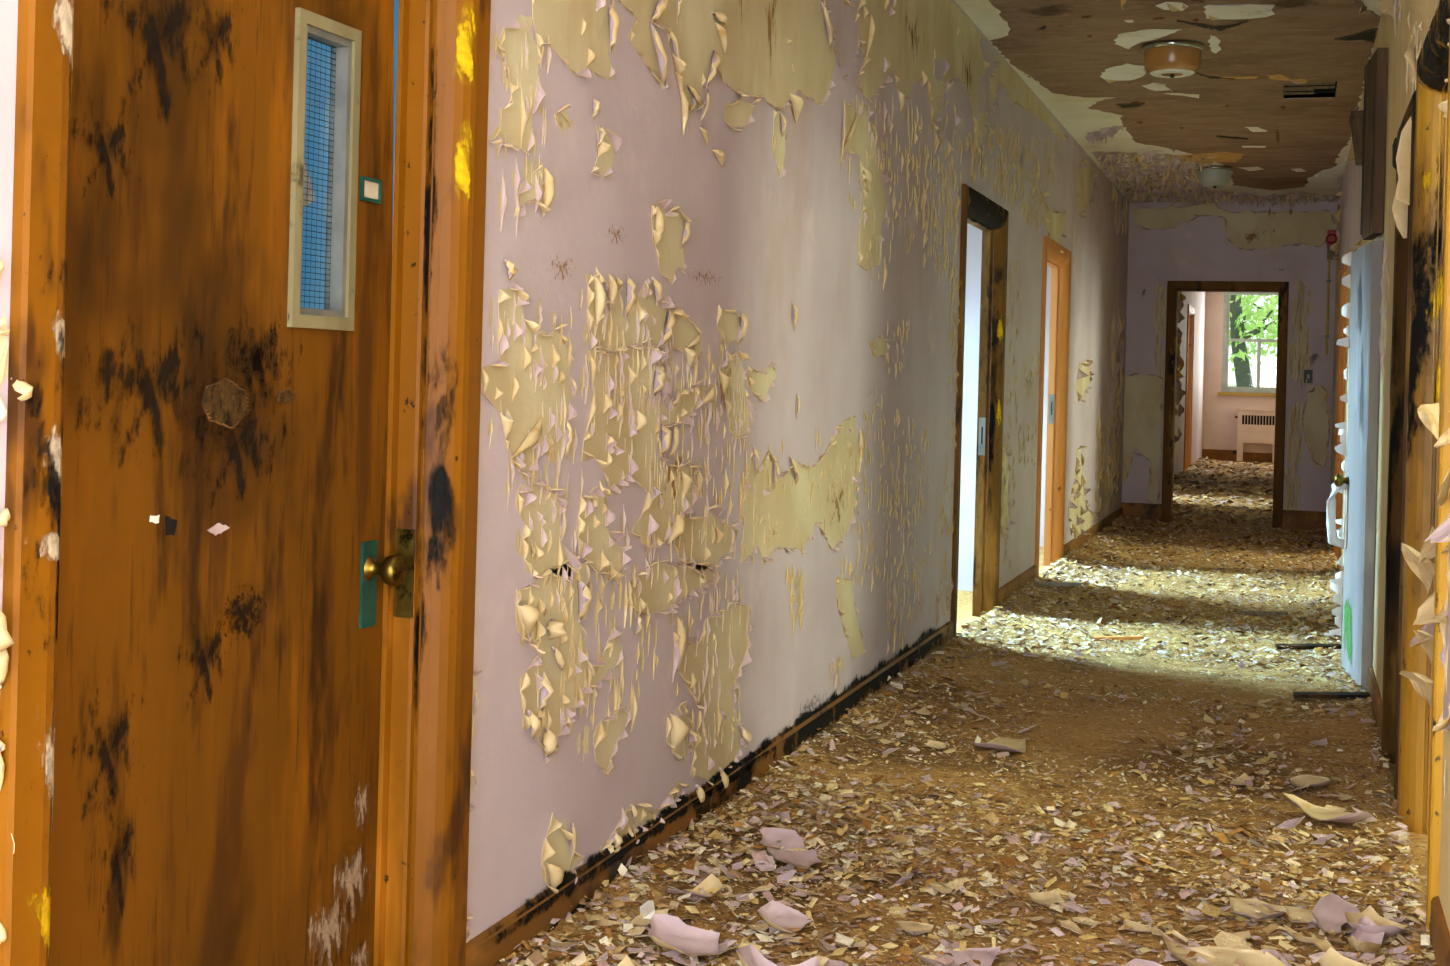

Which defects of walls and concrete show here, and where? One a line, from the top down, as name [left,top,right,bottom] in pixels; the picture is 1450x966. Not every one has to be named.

peeling [1438,99,1448,118]
leakage [424,50,437,318]
peeling [0,316,33,423]
leakage [422,337,456,445]
peeling [481,0,1422,854]
peeling [1417,403,1450,448]
leakage [414,464,456,710]
peeling [1399,468,1450,733]
peeling [470,670,483,811]
peeling [541,813,584,896]